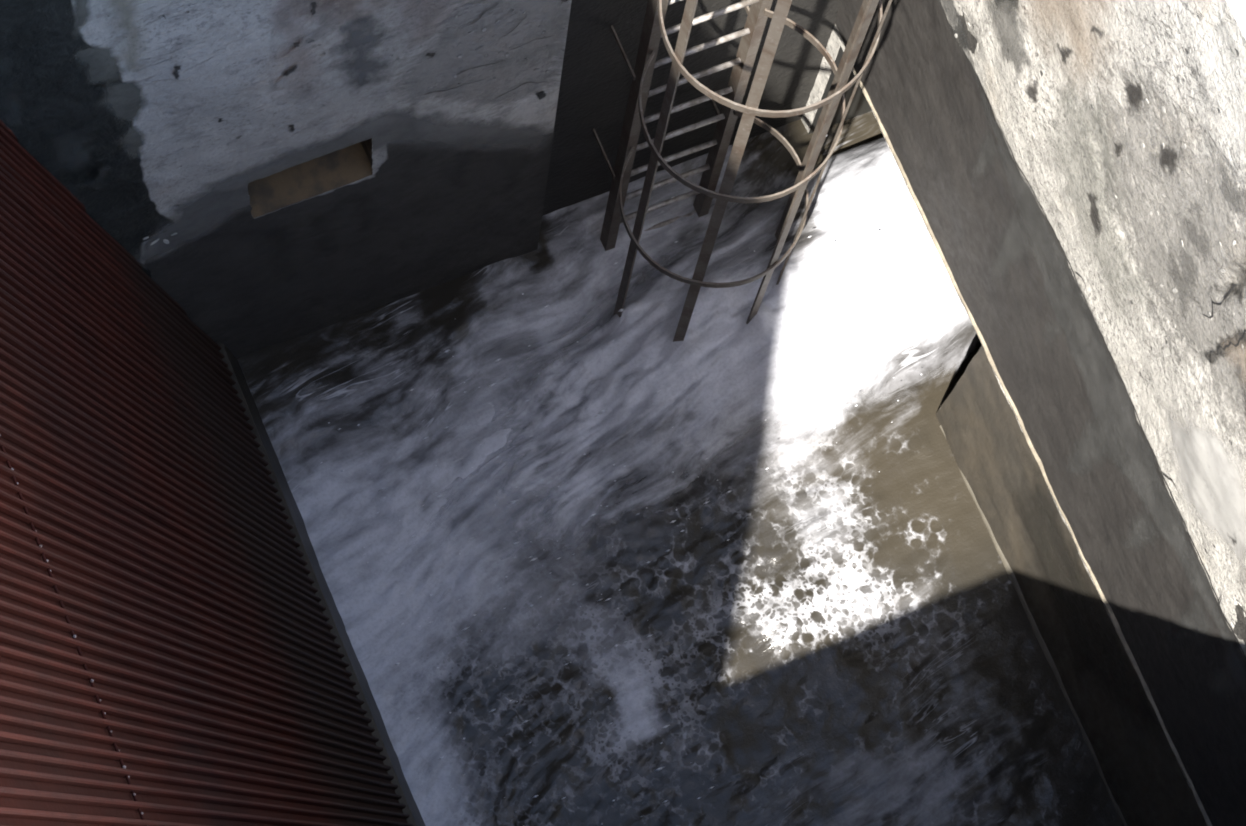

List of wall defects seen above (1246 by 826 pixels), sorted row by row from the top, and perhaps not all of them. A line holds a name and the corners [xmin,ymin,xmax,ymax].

damp [0,0,554,358]
damp [835,0,1246,826]
crack [990,103,1246,659]